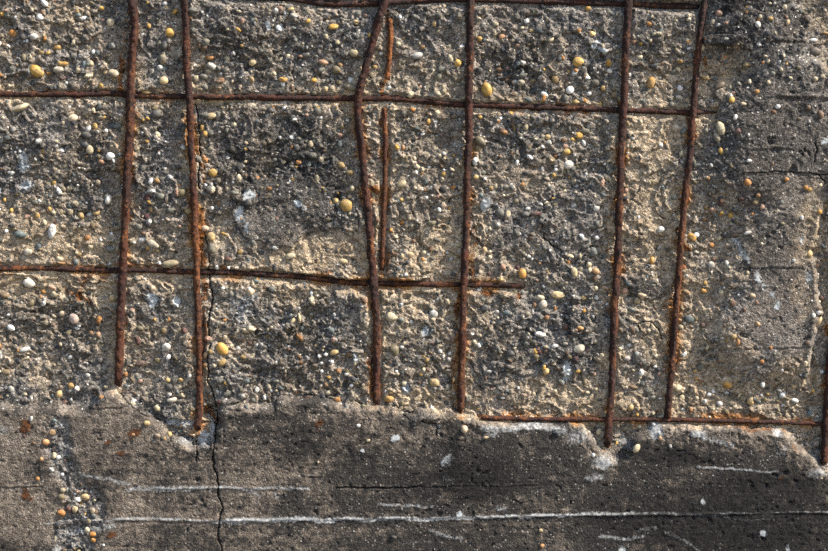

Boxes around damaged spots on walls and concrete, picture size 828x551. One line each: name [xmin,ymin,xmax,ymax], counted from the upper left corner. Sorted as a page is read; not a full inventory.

corrosion [66,264,104,304]
spalling [0,0,624,448]
water stain [46,412,828,551]
spalling [581,0,828,473]